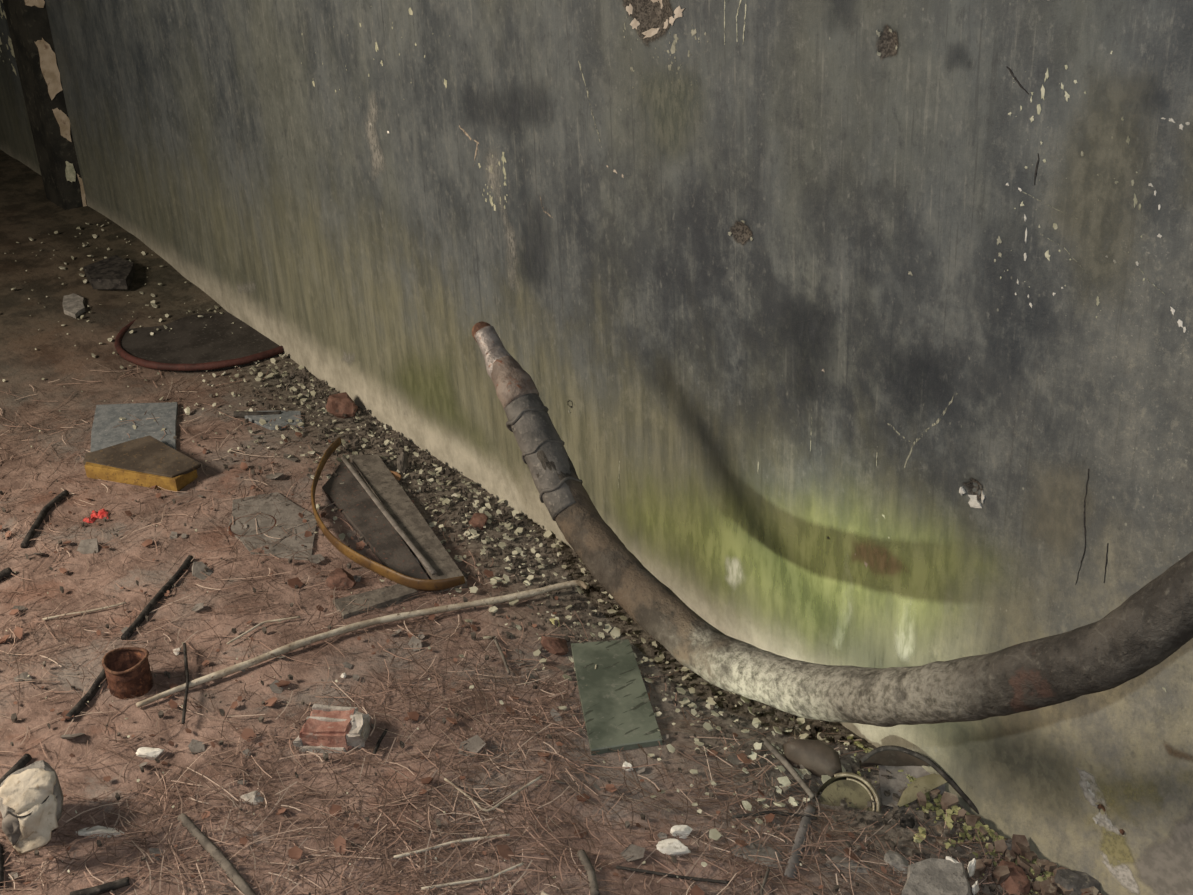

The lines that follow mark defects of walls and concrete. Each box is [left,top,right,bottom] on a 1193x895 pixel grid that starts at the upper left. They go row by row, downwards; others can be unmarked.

flaking render [25,0,45,8]
spalling [623,0,709,86]
spalling [876,25,898,59]